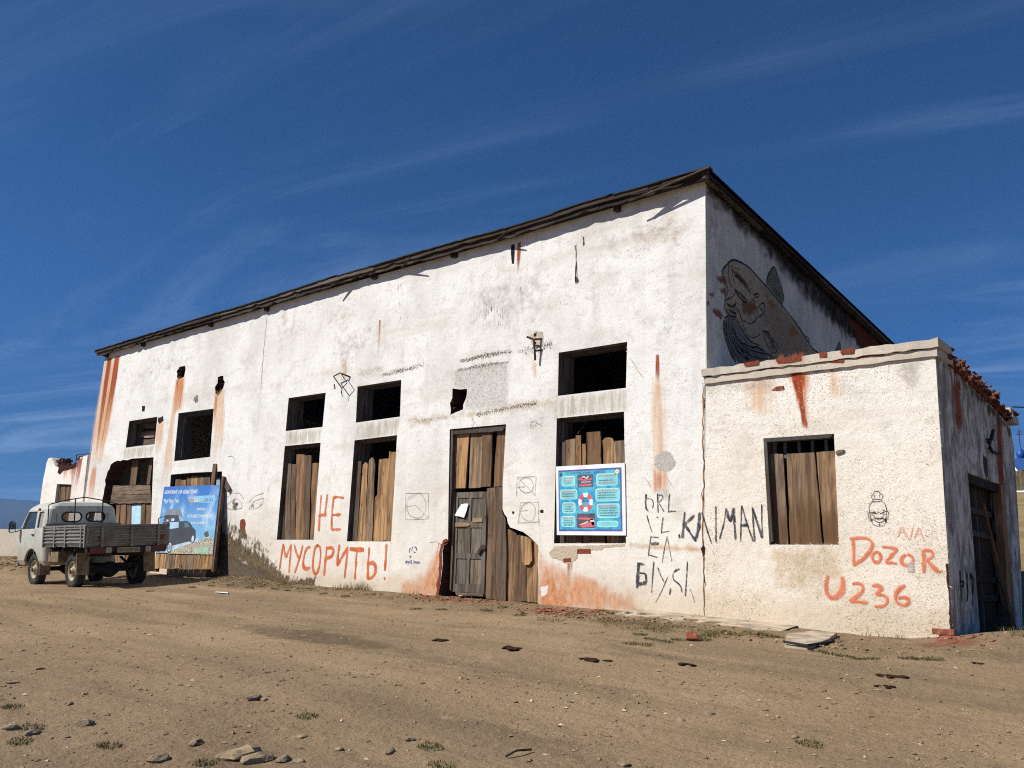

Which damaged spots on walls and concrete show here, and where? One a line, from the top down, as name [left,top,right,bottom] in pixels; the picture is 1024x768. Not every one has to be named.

corrosion [94,356,119,440]
corrosion [159,379,183,438]
corrosion [792,372,807,427]
spalling [56,456,91,474]
corrosion [406,555,439,593]
corrosion [543,564,619,606]
spalling [549,544,625,564]